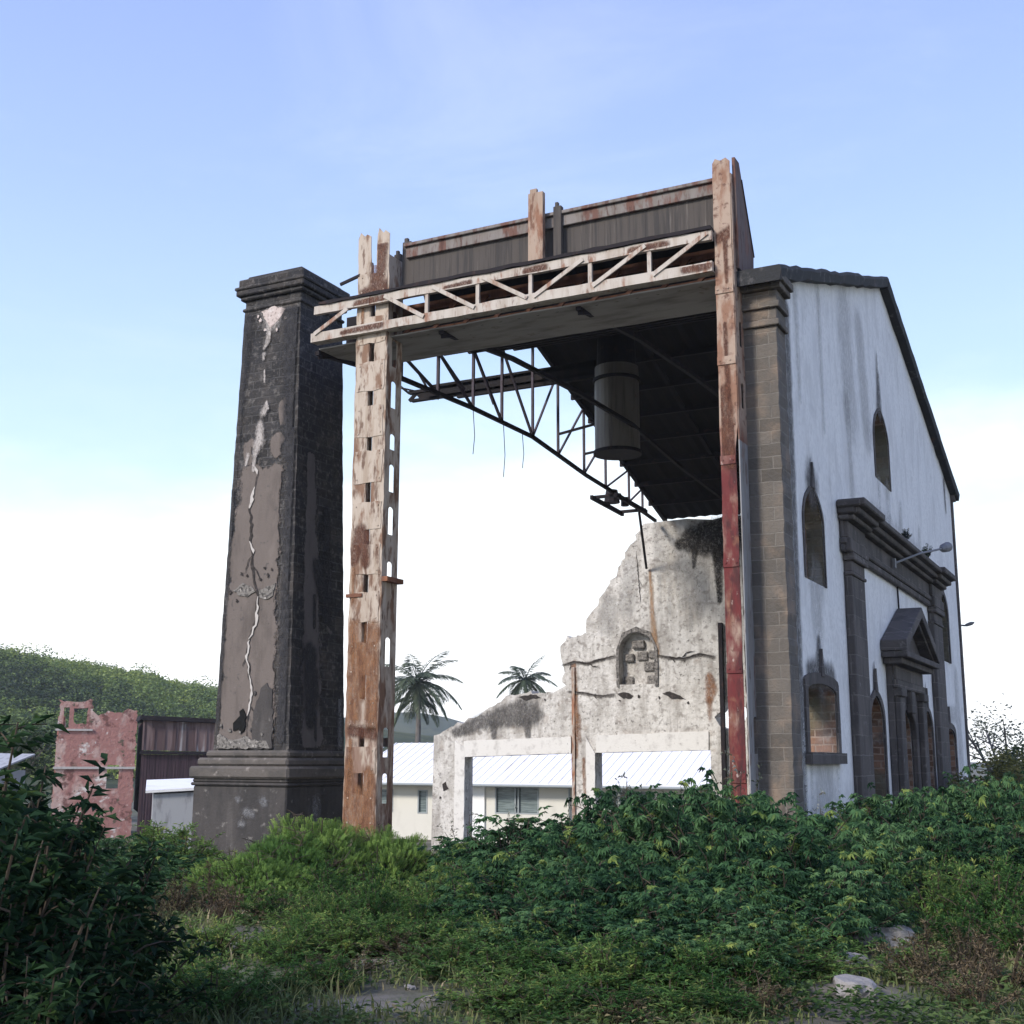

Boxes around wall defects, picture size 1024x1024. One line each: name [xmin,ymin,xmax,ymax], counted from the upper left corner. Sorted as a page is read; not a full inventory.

spalling [257,306,287,332]
rust [340,242,388,334]
rust [681,226,730,283]
rust [720,322,736,468]
crack [242,466,260,736]
peeling [216,398,288,750]
rust [350,524,370,602]
rust [649,570,659,655]
leakage [713,550,723,603]
rust [343,620,379,832]
rust [706,673,716,716]